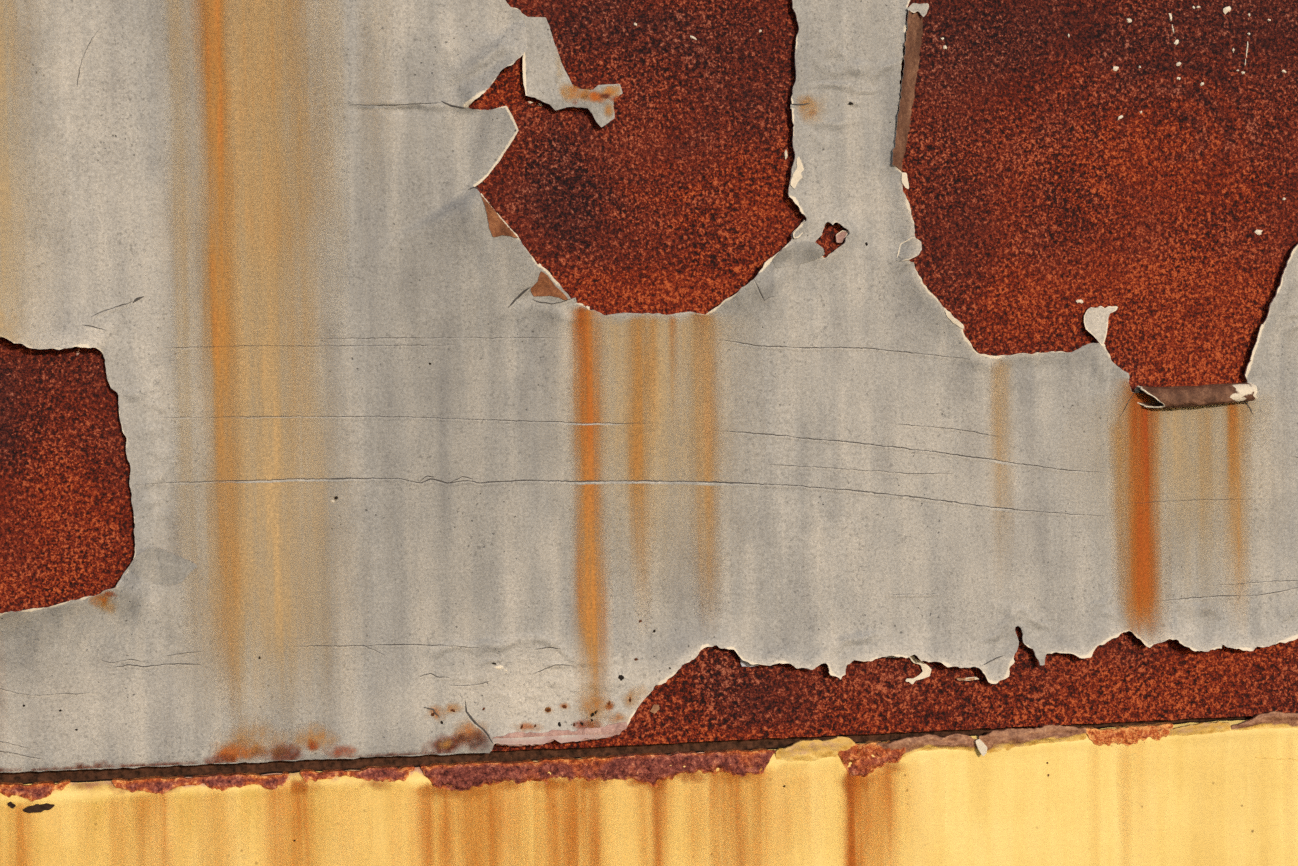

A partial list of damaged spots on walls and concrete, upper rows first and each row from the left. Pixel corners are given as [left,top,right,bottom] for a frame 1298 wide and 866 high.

peeling [0,337,198,618]
corrosion [200,0,338,678]
corrosion [520,308,714,729]
peeling [460,0,849,315]
peeling [892,0,1298,408]
corrosion [1117,385,1242,626]
corrosion [112,706,776,856]
peeling [491,626,1298,762]
corrosion [1079,722,1173,746]